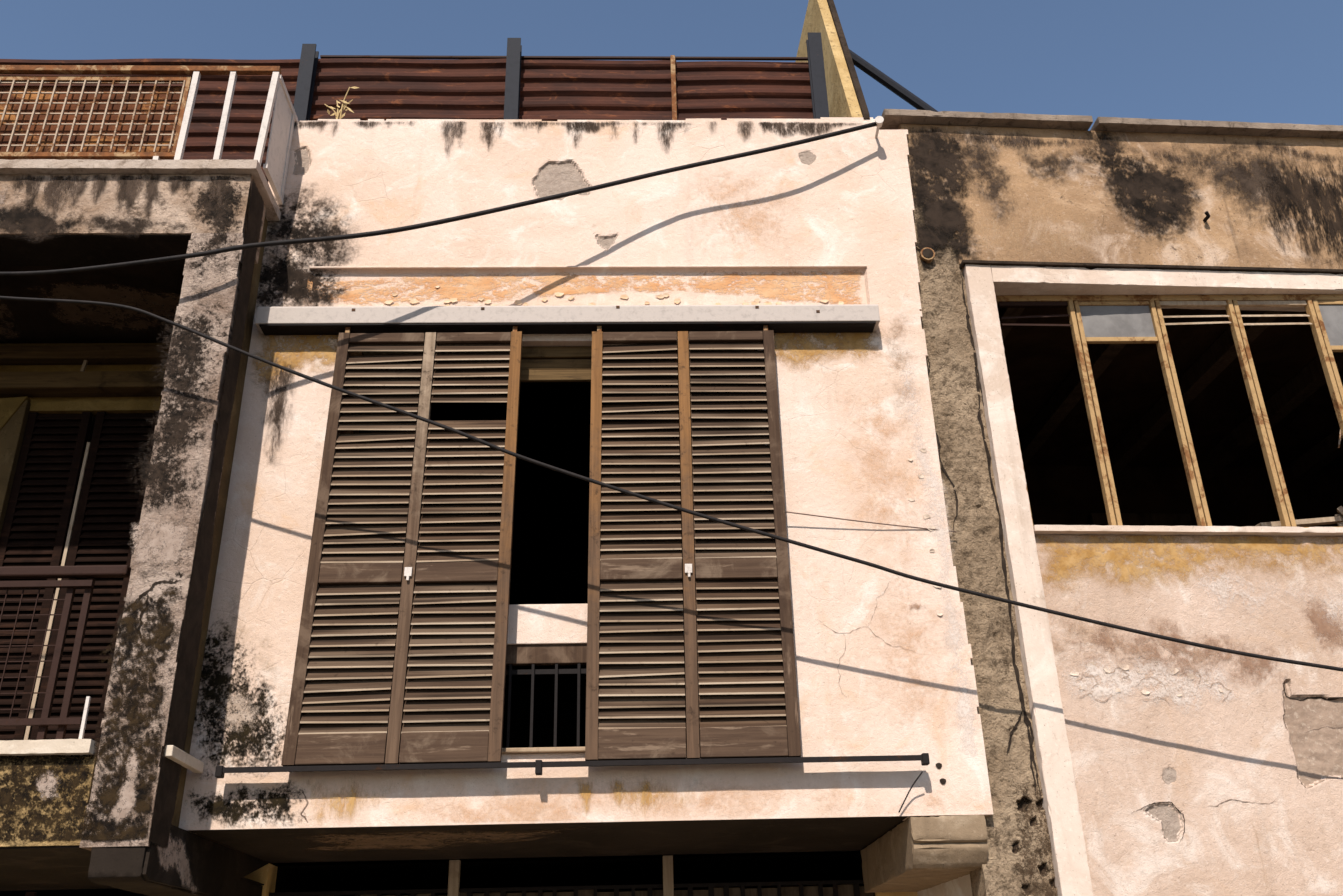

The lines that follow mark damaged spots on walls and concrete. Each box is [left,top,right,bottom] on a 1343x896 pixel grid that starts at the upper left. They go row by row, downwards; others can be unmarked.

damp [444,121,463,149]
damp [482,122,502,148]
flaking render [533,161,590,200]
damp [658,122,674,146]
damp [907,131,1008,267]
damp [1025,132,1343,262]
damp [0,175,348,848]
crack [935,431,958,531]
crack [960,272,1041,796]
flaking render [1132,802,1185,842]
flaking render [1162,767,1177,784]
flaking render [1283,679,1343,788]